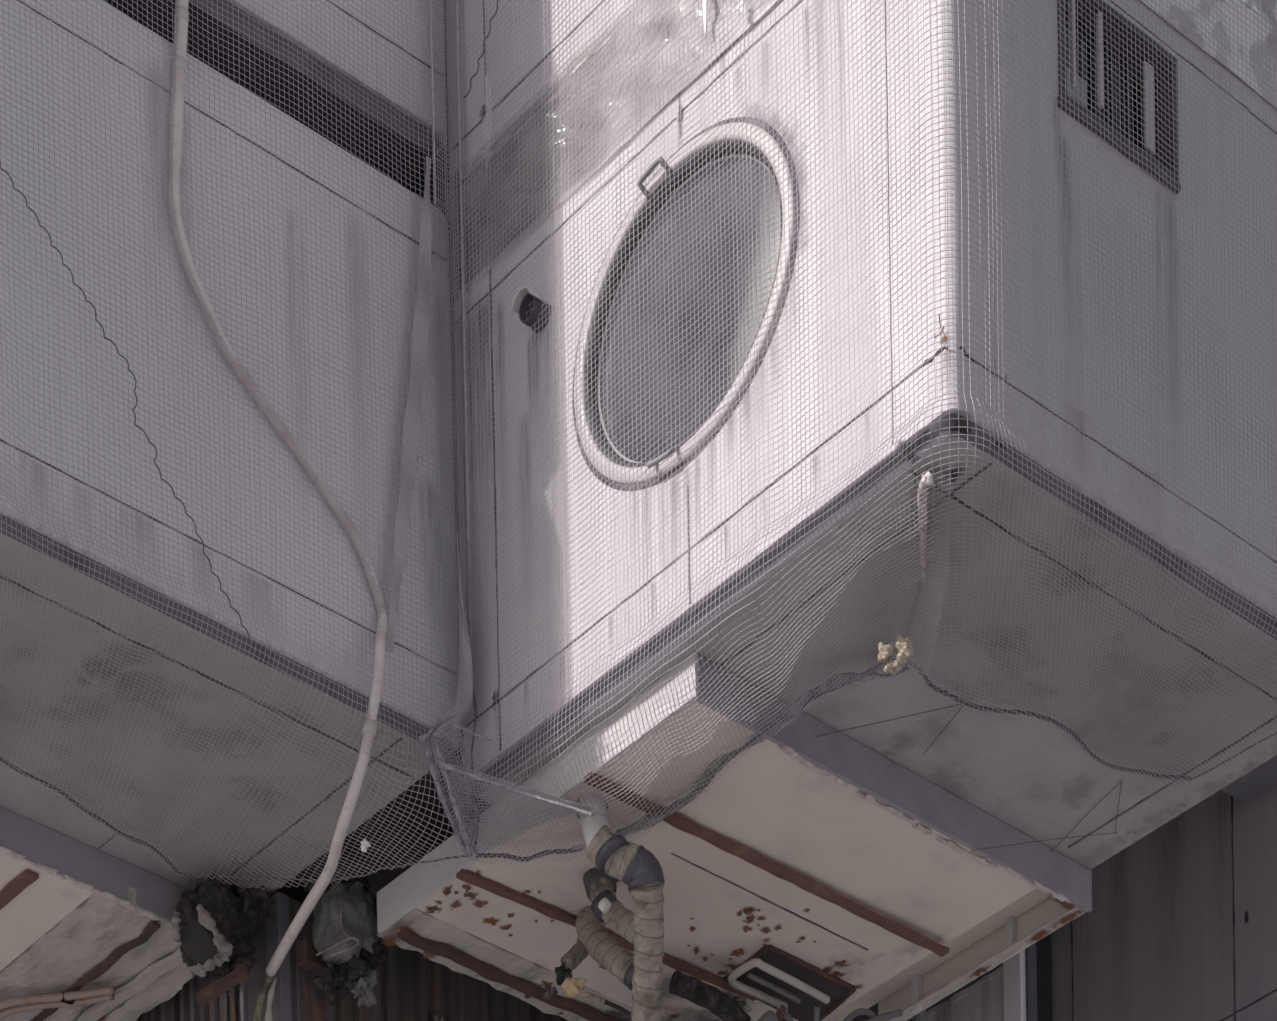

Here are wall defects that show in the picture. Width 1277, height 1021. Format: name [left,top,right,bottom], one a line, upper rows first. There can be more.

corrosion [425,871,514,937]
corrosion [737,907,781,945]
corrosion [718,948,746,975]
corrosion [823,960,849,978]